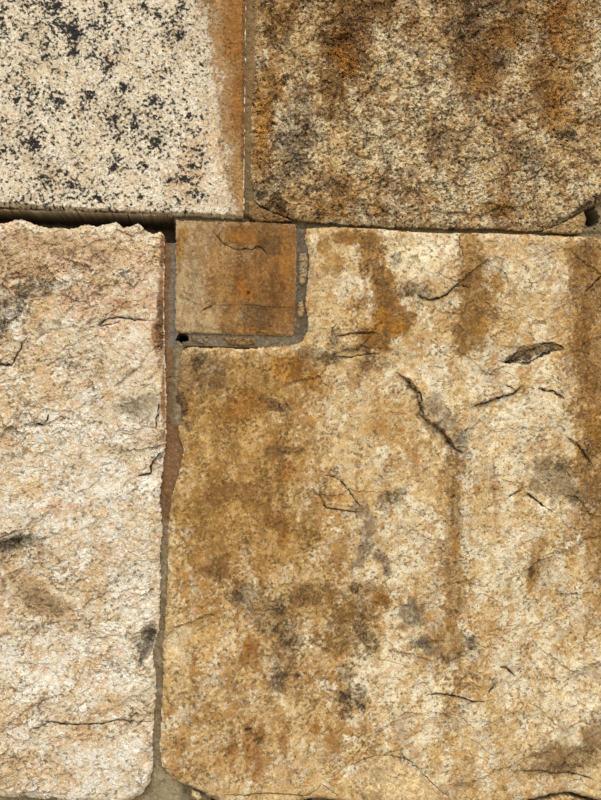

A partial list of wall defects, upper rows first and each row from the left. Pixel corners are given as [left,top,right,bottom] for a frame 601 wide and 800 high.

crack [421,282,468,300]
crack [498,343,564,364]
crack [473,385,564,407]
crack [395,371,465,453]